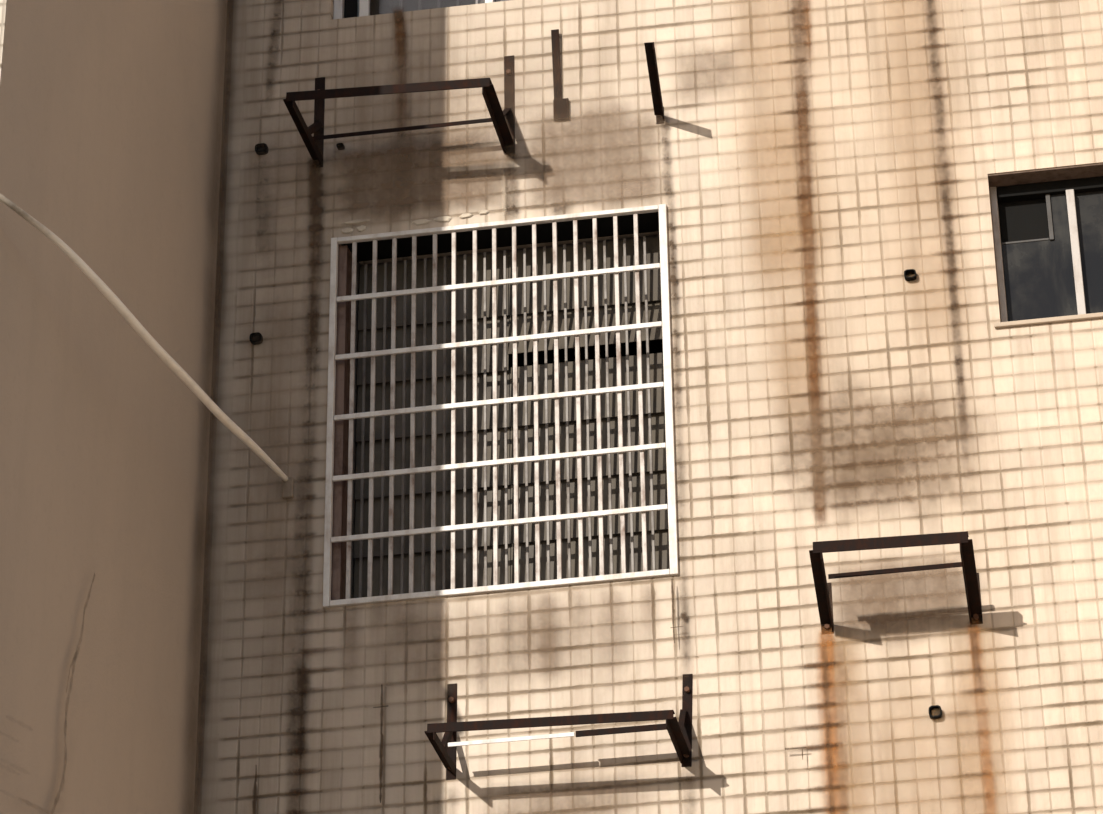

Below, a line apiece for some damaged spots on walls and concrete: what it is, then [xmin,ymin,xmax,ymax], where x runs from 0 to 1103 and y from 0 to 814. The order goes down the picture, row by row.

rust [792,0,810,62]
water stain [222,71,231,134]
water stain [503,145,517,214]
rust [766,75,812,255]
water stain [207,149,227,428]
rust [806,299,819,414]
water stain [790,399,963,507]
water stain [193,450,213,796]
water stain [288,688,307,796]
rust [804,633,855,814]